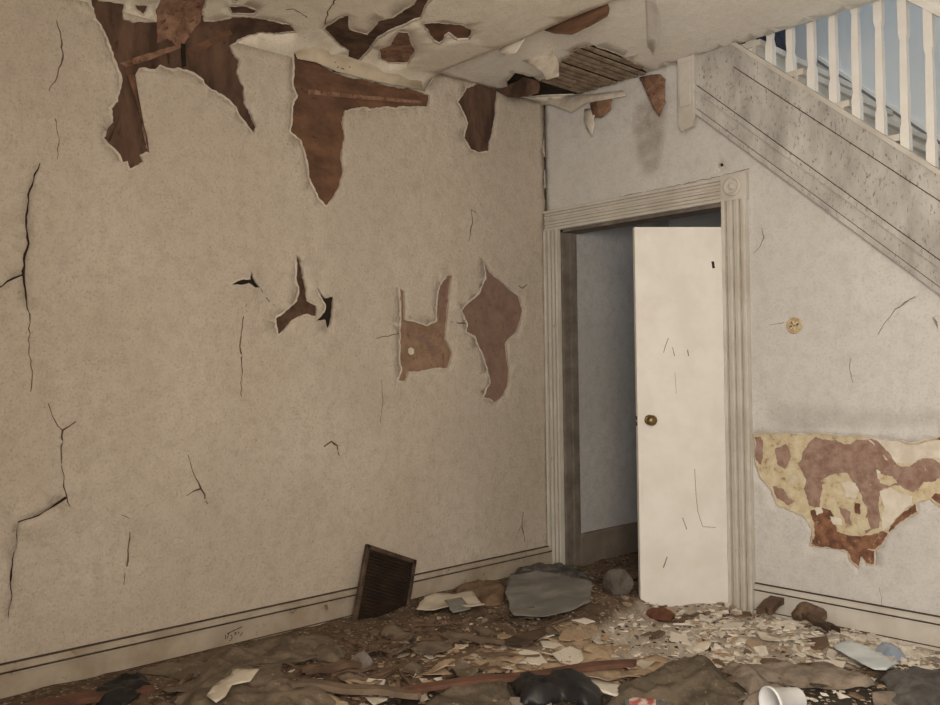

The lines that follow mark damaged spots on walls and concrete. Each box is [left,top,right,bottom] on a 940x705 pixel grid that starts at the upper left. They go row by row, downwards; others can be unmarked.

crack [49,20,64,91]
peeling [88,0,297,171]
peeling [289,0,474,208]
peeling [457,84,499,154]
crack [0,118,76,616]
flaking render [275,253,334,336]
peeling [397,274,453,383]
peeling [461,258,524,404]
crack [188,455,208,504]
peeling [752,432,940,569]